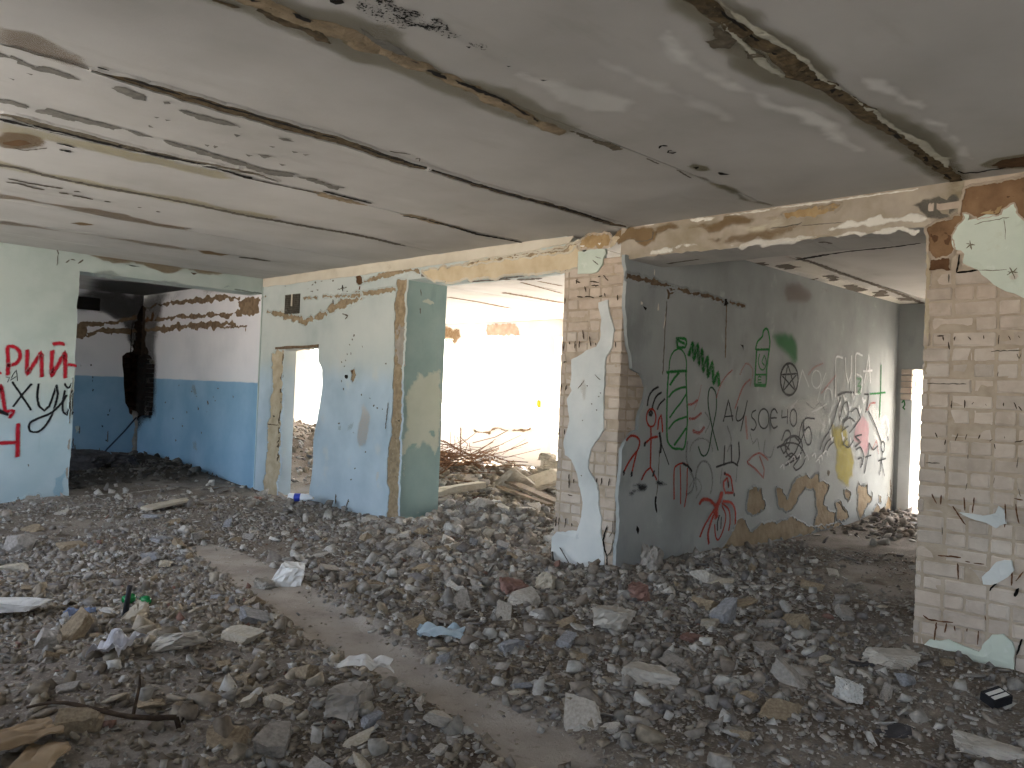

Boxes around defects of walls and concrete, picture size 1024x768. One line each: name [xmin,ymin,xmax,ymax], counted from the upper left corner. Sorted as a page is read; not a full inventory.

peeling [0,53,79,80]
crack [683,0,1006,182]
peeling [0,99,170,137]
peeling [164,102,241,137]
crack [0,45,630,229]
peeling [7,178,110,202]
peeling [164,138,345,190]
crack [401,214,522,243]
spalling [690,188,918,229]
spalling [924,174,1024,374]
spalling [76,267,443,518]
peeling [721,470,892,548]